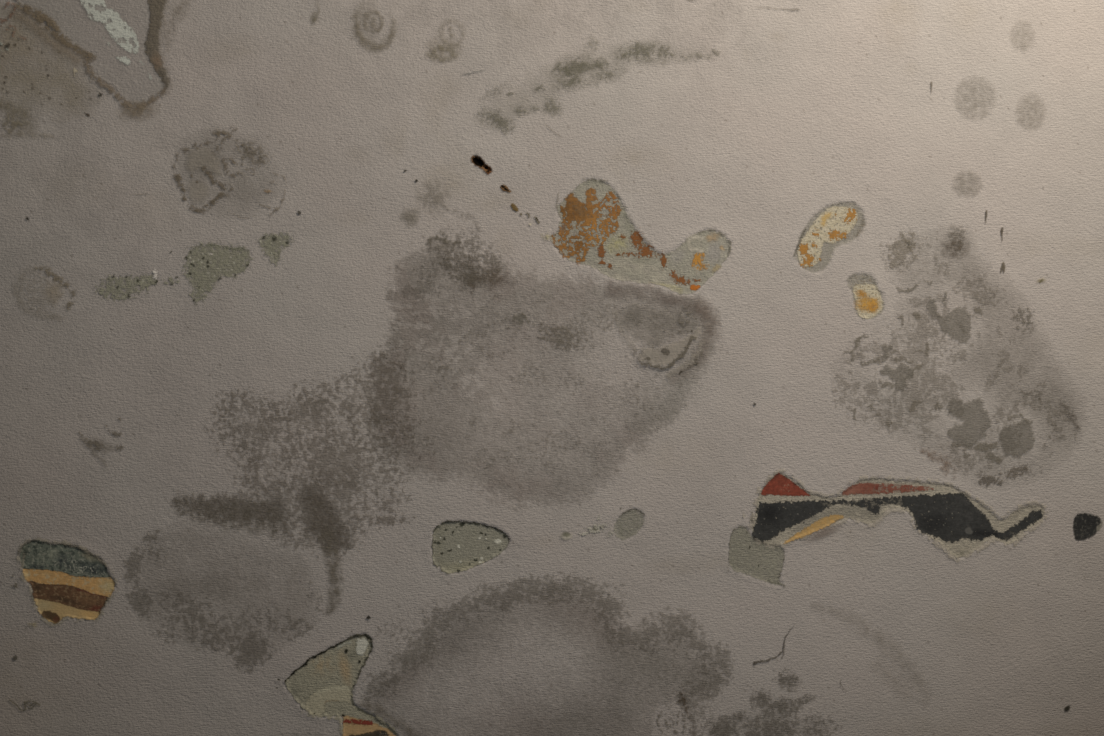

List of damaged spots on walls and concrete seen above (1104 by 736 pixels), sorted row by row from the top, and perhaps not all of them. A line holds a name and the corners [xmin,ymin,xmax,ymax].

flaking render [0,0,170,116]
flaking render [95,232,293,305]
flaking render [546,179,731,294]
flaking render [797,203,864,271]
flaking render [849,274,883,319]
water stain [935,400,1032,486]
flaking render [432,521,509,574]
flaking render [729,526,785,586]